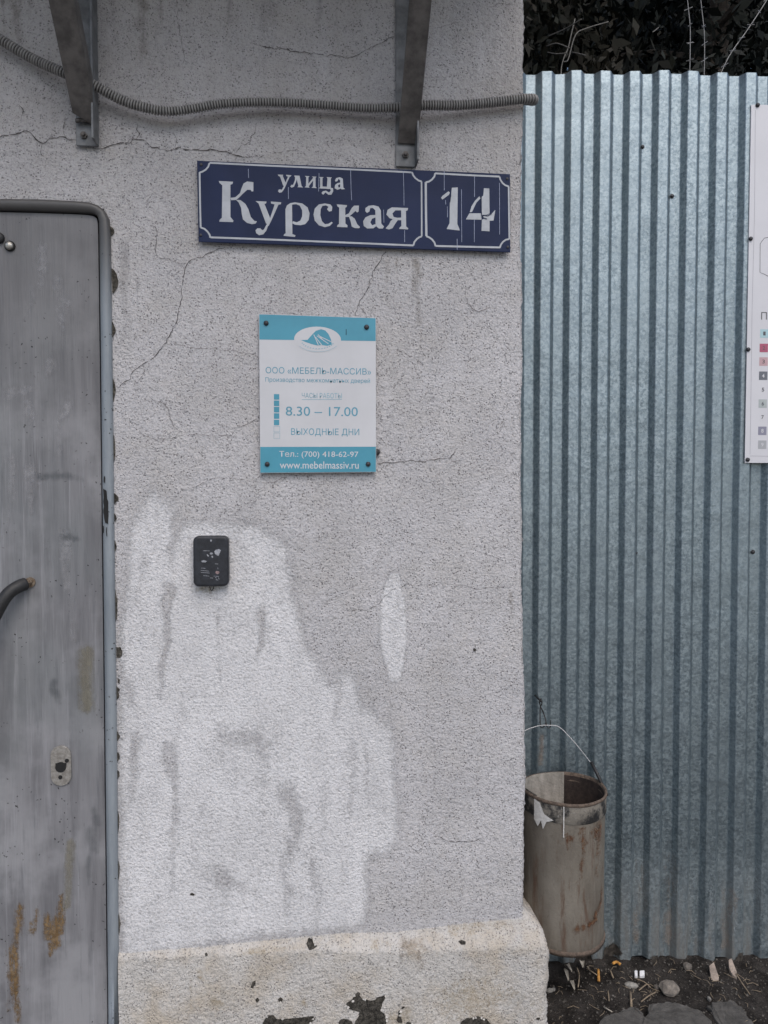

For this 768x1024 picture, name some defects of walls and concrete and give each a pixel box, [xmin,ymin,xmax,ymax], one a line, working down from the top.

crack [0,105,73,158]
crack [99,123,304,157]
crack [118,225,256,441]
spalling [263,1015,315,1024]
spalling [339,992,413,1024]